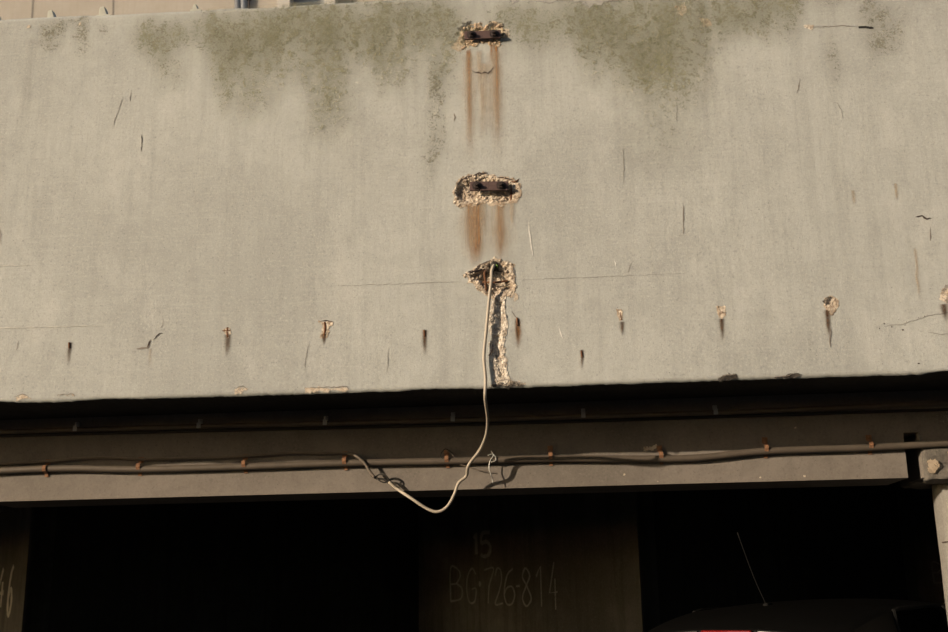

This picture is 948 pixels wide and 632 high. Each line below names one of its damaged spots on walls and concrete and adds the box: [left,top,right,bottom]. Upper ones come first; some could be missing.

spalling [451,21,510,52]
spalling [452,171,521,209]
corrosion [467,205,480,252]
spalling [462,256,526,389]